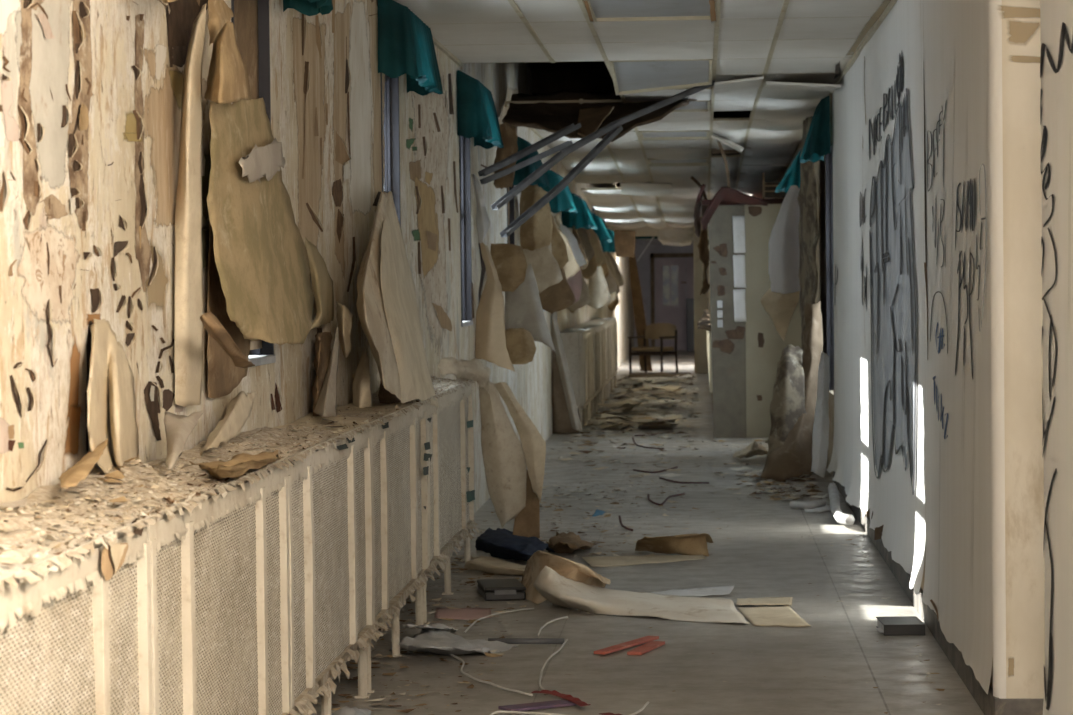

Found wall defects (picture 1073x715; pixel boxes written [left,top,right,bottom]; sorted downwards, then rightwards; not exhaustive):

flaking render [0,0,93,323]
spalling [87,288,104,325]
flaking render [116,0,208,347]
spalling [144,325,183,441]
peeling [291,0,385,279]
spalling [409,65,454,350]
peeling [711,244,727,296]
peeling [712,326,745,354]